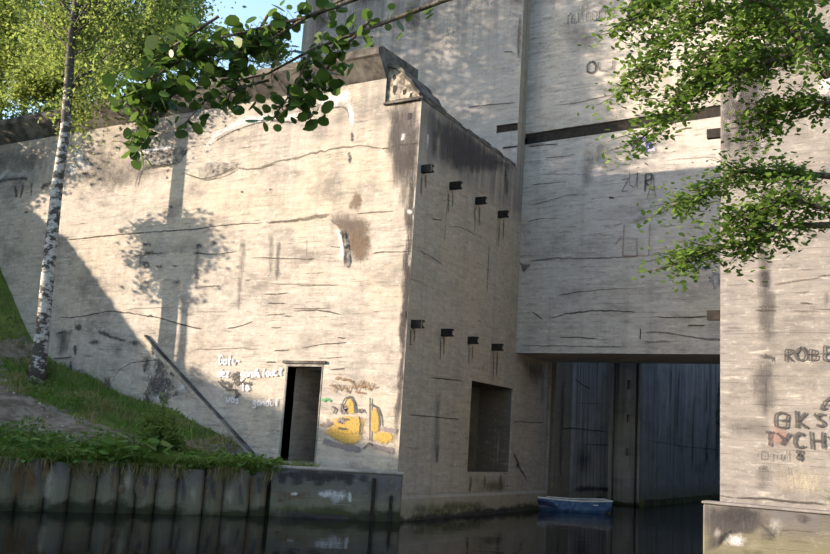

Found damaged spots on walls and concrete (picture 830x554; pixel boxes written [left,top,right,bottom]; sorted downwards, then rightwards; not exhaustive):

water stain [725,76,766,148]
spalling [135,146,188,185]
crack [240,143,416,170]
crack [70,215,326,240]
water stain [333,220,368,260]
water stain [388,99,509,417]
crack [61,307,201,329]
crack [267,284,338,328]
water stain [760,254,772,332]
crack [267,337,346,370]
water stain [706,383,720,458]